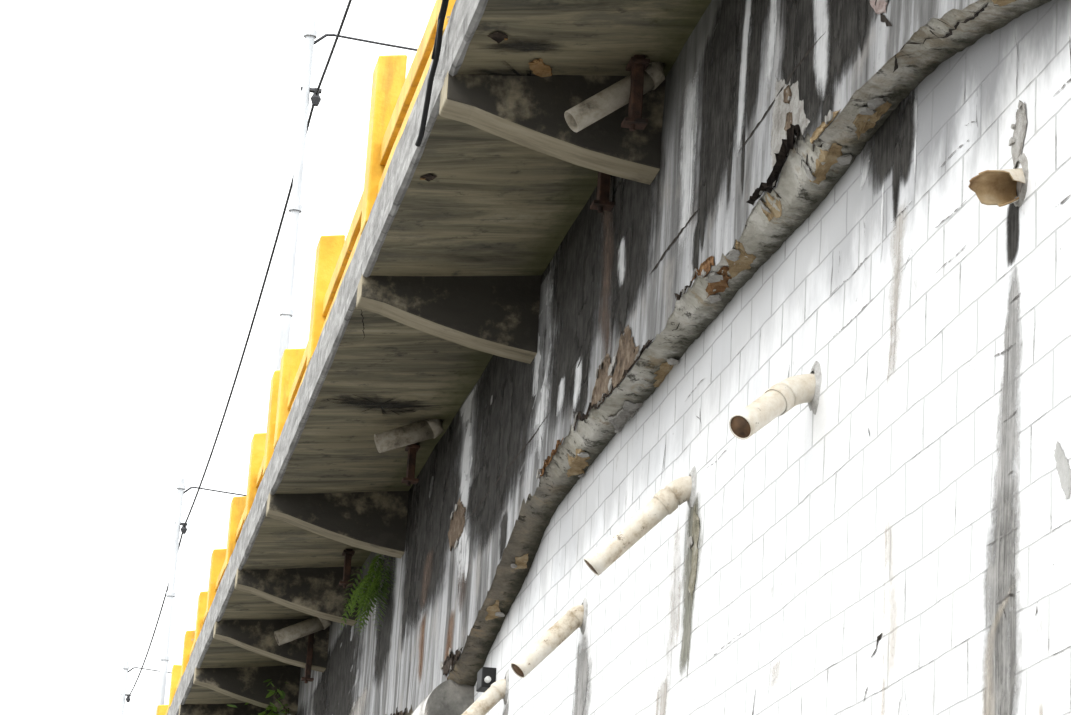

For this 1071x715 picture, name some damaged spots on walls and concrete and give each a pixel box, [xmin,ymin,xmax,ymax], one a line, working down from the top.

damp [490,41,558,52]
damp [680,0,877,280]
crack [738,33,825,153]
peeling [747,78,853,222]
crack [794,143,823,167]
peeling [870,0,888,14]
spalling [1008,100,1027,164]
spalling [674,240,756,304]
spalling [573,325,653,433]
spalling [536,438,590,480]
damp [983,192,1022,715]
damp [671,499,700,673]